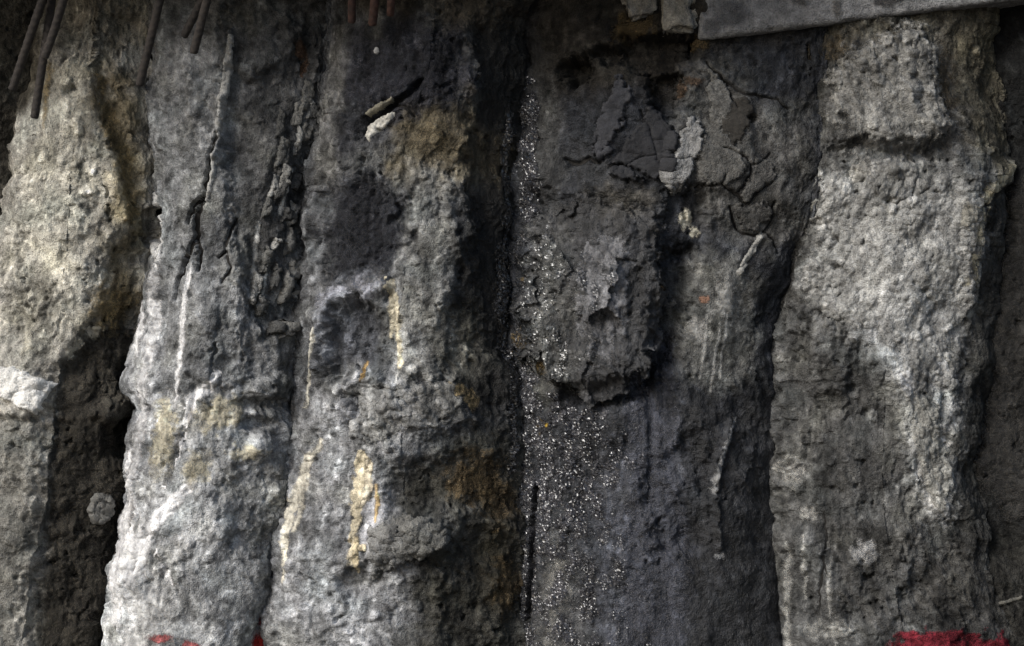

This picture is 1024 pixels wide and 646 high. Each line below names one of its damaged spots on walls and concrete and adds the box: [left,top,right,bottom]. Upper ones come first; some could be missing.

corrosion [92,72,141,223]
crack [181,134,237,283]
peeling [591,68,777,276]
crack [683,153,777,253]
crack [706,63,787,109]
damp [493,76,693,646]